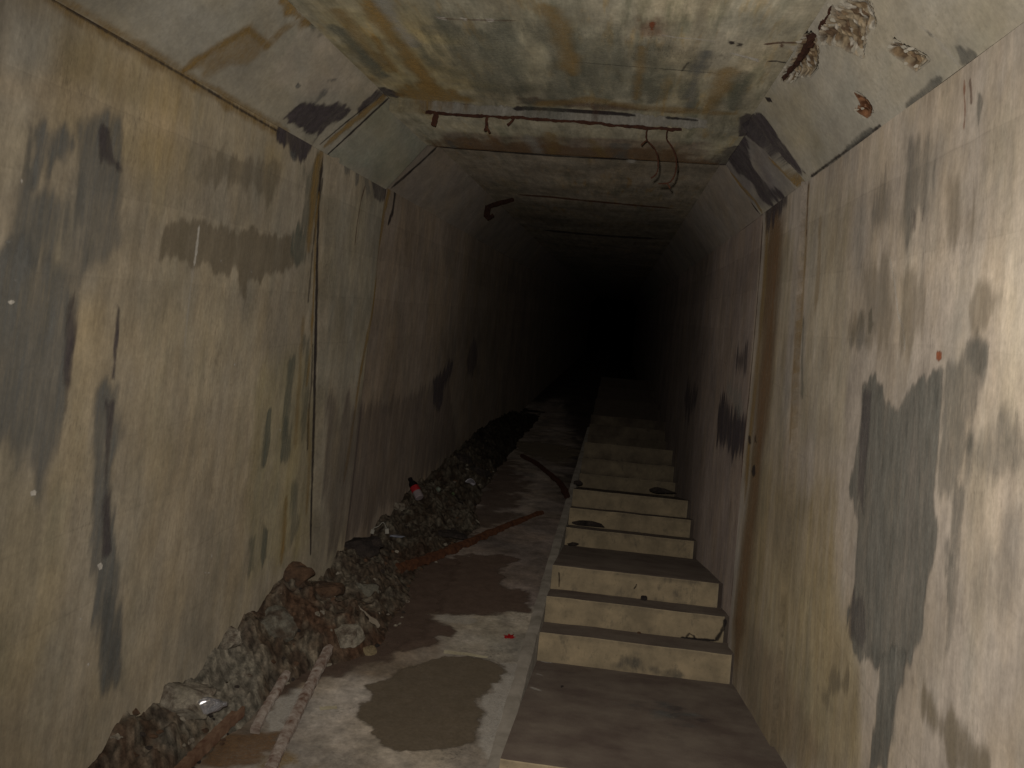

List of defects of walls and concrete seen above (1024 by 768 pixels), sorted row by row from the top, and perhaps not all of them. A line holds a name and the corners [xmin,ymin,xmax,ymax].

water stain [277,25,403,203]
water stain [720,80,805,231]
spalling [781,0,877,83]
spalling [854,92,873,119]
spalling [887,41,928,72]
water stain [0,113,121,486]
water stain [161,220,307,296]
water stain [92,310,121,692]
water stain [266,553,531,732]
water stain [357,656,513,753]
water stain [847,369,946,768]